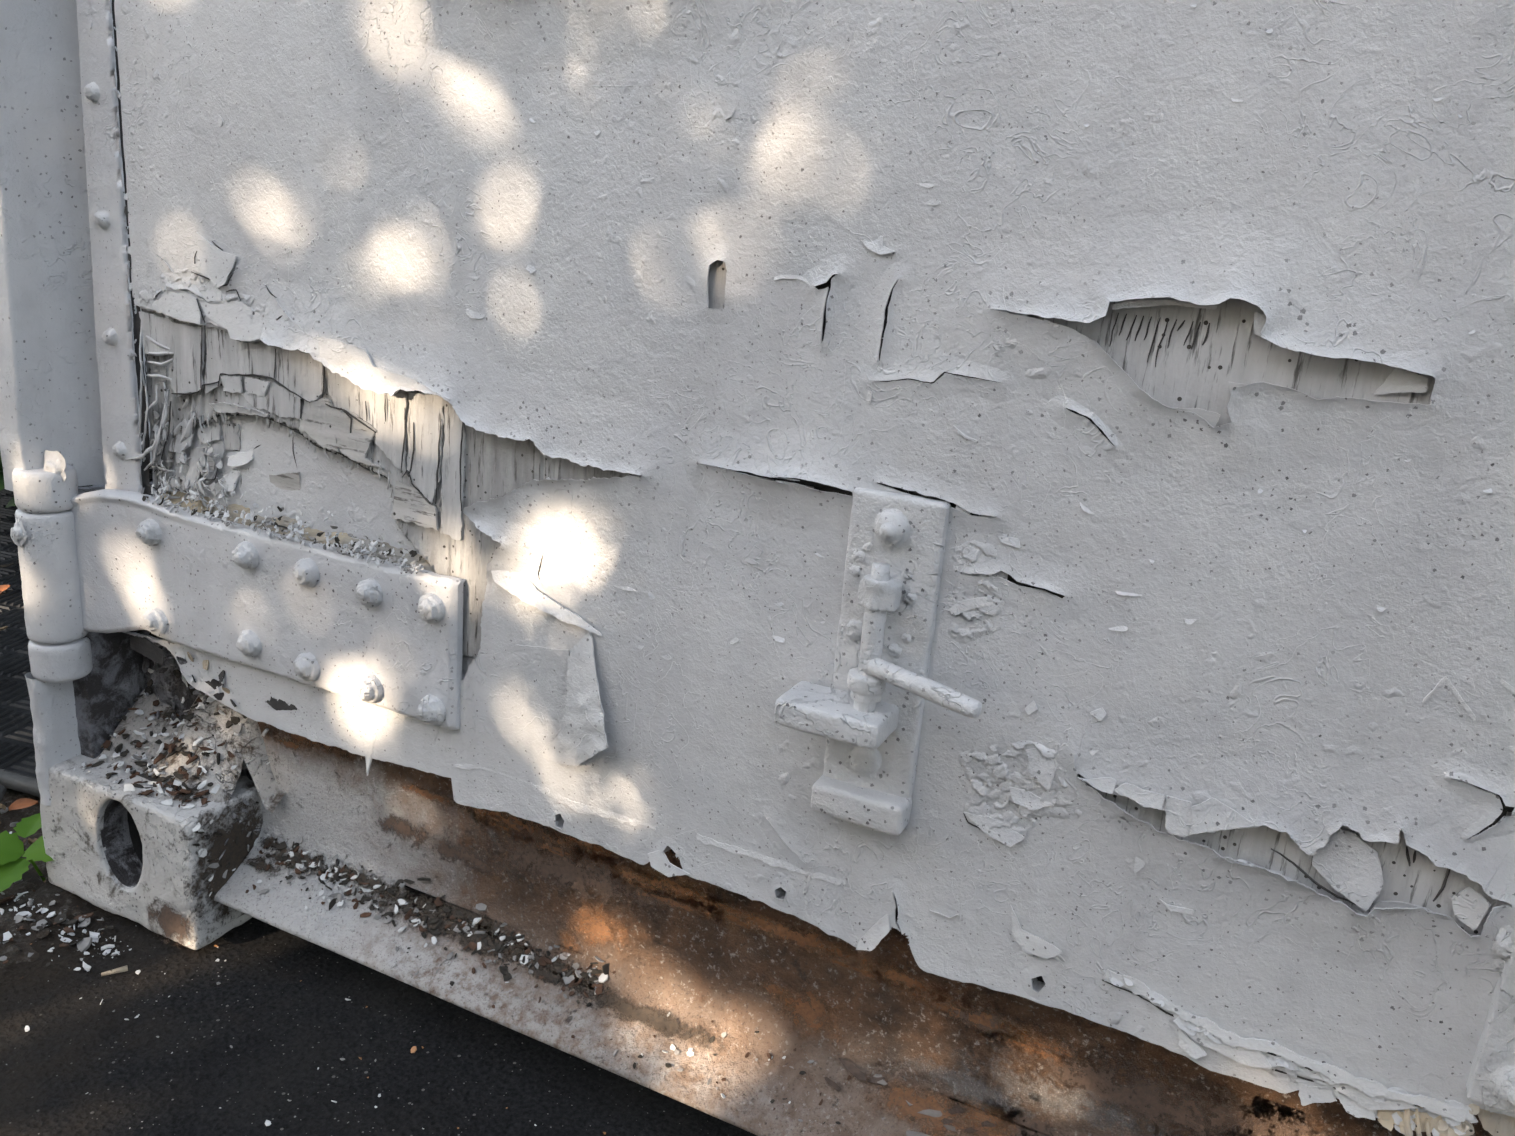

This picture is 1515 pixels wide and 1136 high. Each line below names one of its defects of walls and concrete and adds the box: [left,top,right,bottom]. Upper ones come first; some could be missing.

crack [799,253,1125,464]
peeling [930,210,1515,497]
crack [683,426,1093,623]
corrosion [148,901,195,945]
corrosion [113,737,237,805]
corrosion [258,723,349,759]
peeling [454,570,608,766]
corrosion [375,784,1338,1136]
peeling [958,701,1515,993]
peeling [1102,969,1515,1136]
crack [1423,677,1476,721]
crack [1429,757,1515,843]